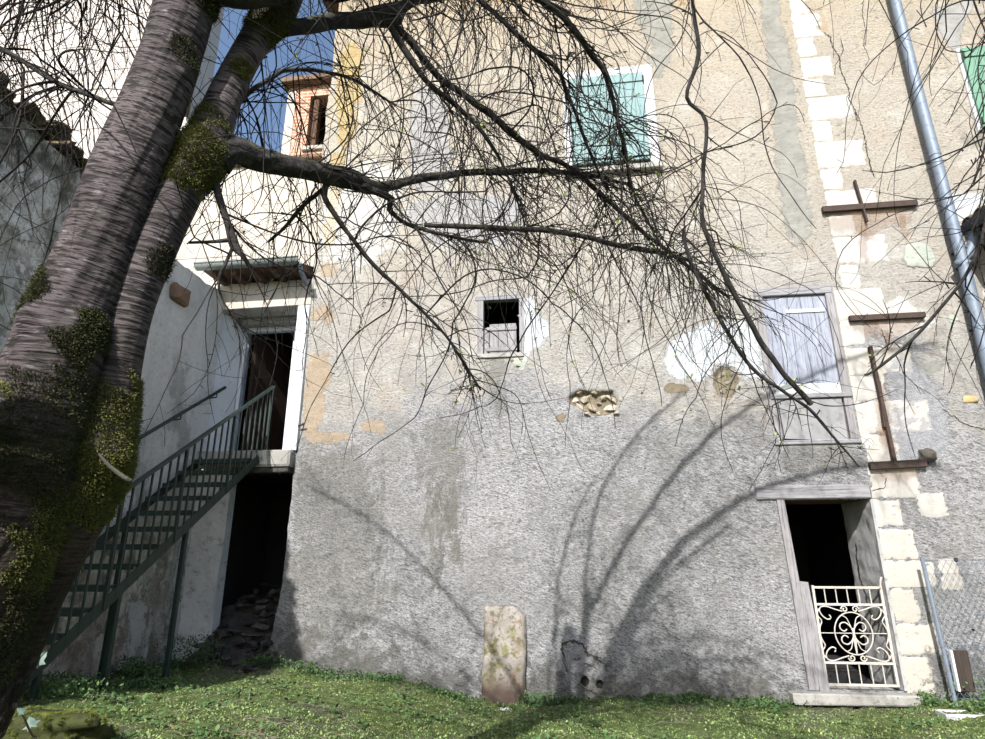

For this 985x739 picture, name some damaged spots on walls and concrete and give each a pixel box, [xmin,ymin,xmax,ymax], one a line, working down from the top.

spalling [556,389,619,422]